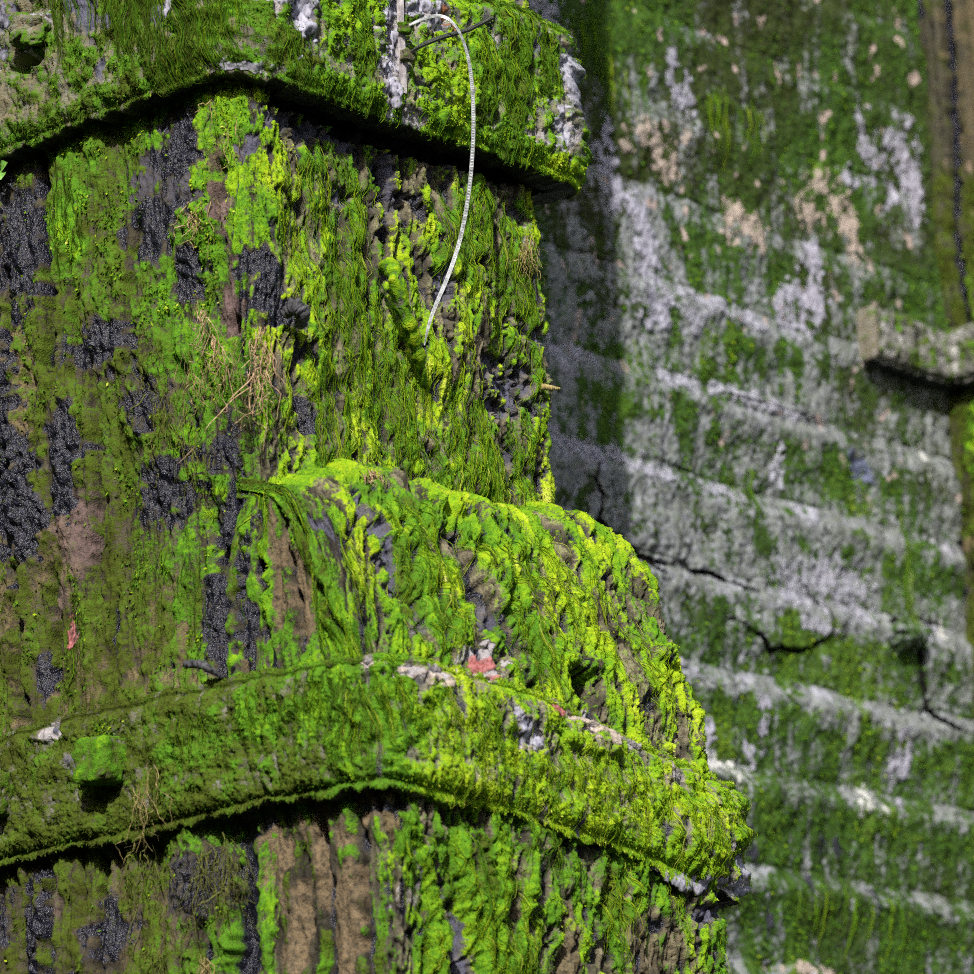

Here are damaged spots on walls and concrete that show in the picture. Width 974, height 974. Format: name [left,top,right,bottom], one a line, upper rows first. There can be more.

crack [594,460,759,591]
crack [725,579,835,663]
leakage [899,505,955,654]
crack [888,612,961,731]
leakage [704,716,720,764]
leakage [743,697,772,771]
leakage [854,725,920,823]